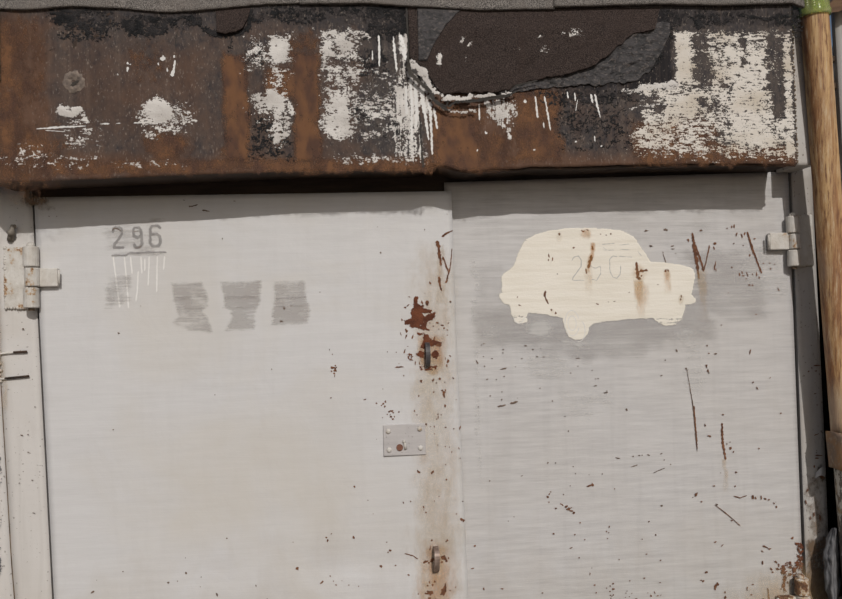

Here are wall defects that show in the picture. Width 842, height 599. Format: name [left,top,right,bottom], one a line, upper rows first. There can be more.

rust [0,19,564,182]
peeling [622,29,799,163]
rust [631,121,794,166]
rust [395,296,451,376]
rust [775,507,829,599]